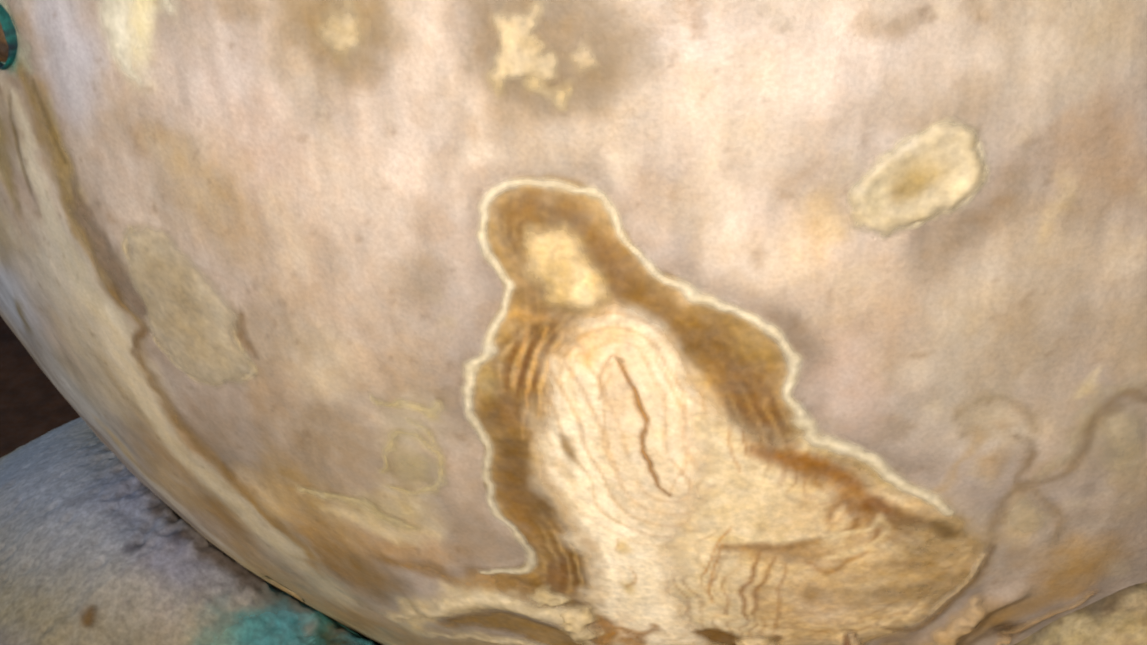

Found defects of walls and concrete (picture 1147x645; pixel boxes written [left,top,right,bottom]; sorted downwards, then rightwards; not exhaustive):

rust [0,23,9,62]
peeling [490,3,556,91]
peeling [573,47,596,69]
rust [20,67,210,459]
crack [620,363,668,494]
spalling [886,550,992,645]